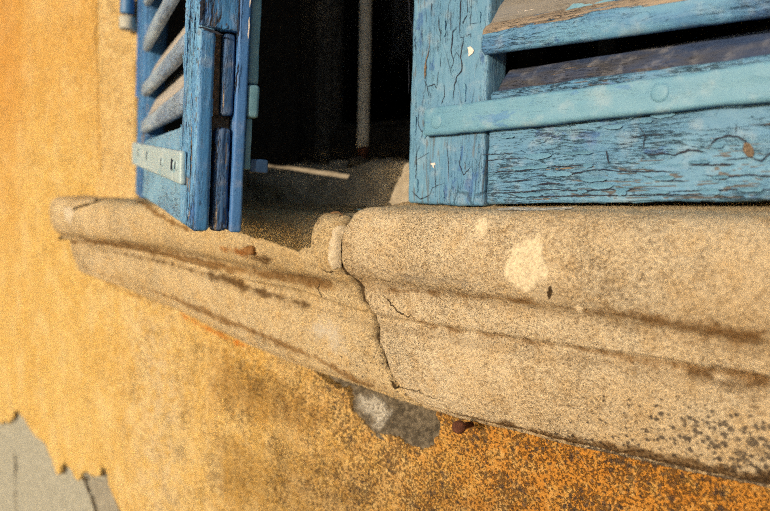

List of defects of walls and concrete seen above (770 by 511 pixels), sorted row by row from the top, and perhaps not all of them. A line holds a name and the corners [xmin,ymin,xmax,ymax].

crack [72,5,117,211]
crack [317,223,440,401]
peeling [0,411,120,511]
spalling [330,376,441,449]
water stain [595,443,770,485]